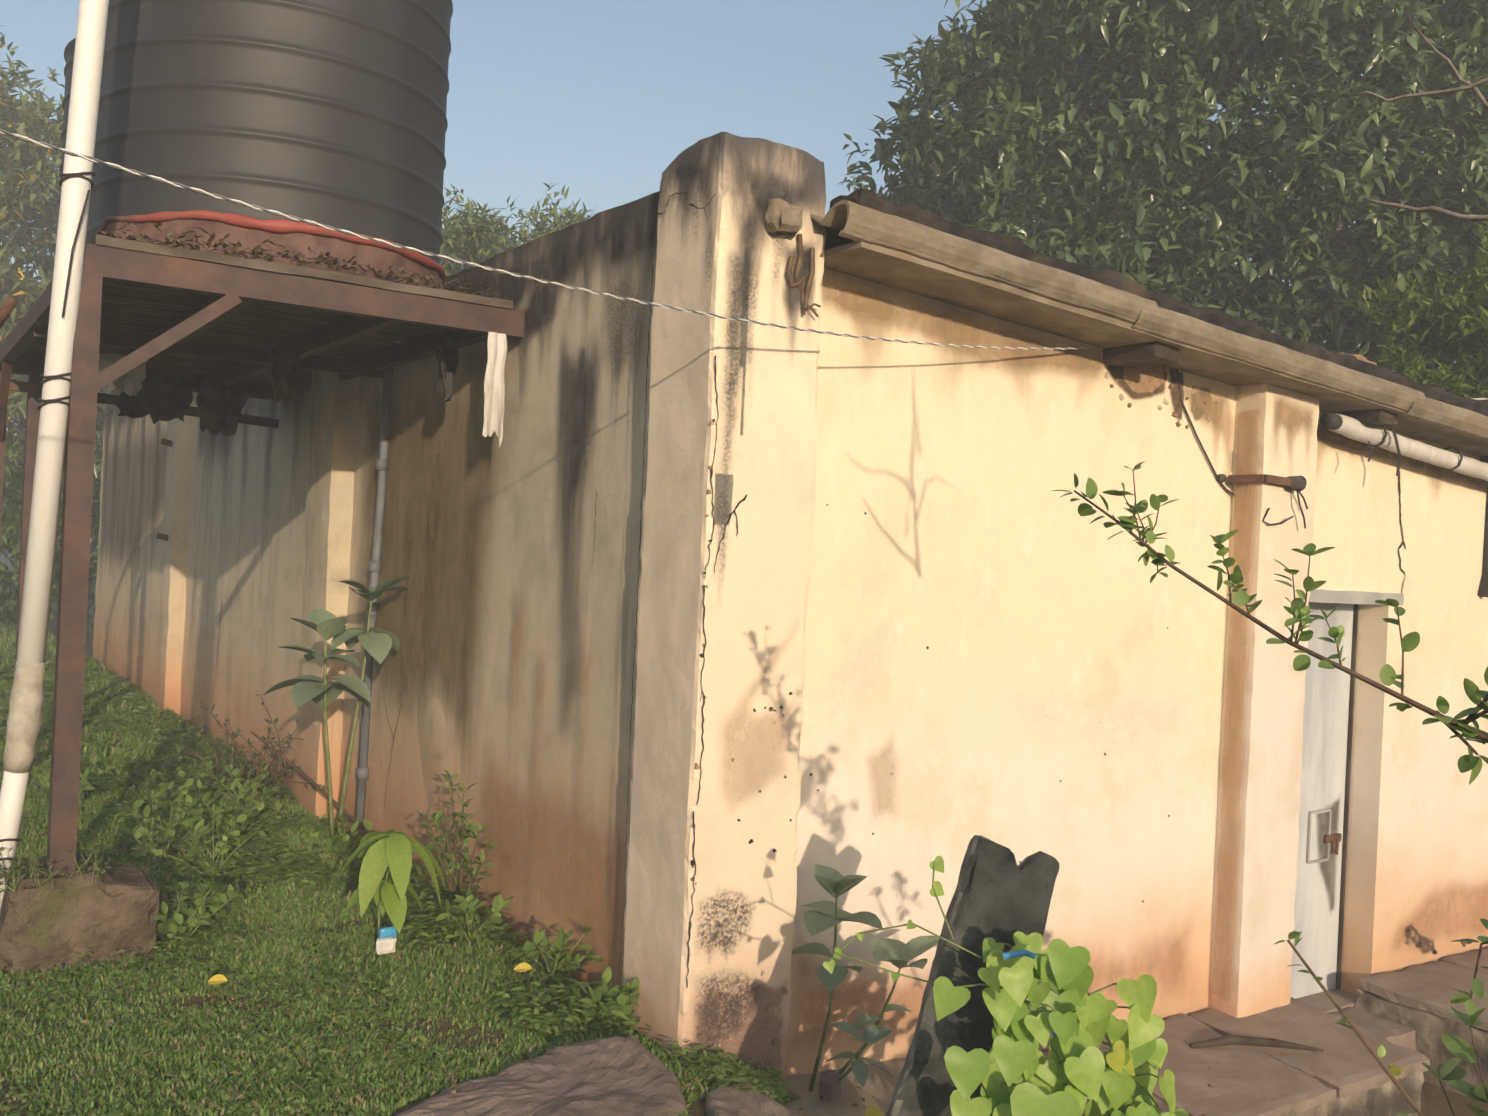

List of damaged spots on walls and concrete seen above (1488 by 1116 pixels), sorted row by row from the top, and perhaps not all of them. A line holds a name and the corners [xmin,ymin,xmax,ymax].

damp [459,190,665,697]
crack [714,494,747,573]
damp [700,897,749,950]
damp [699,975,757,1049]